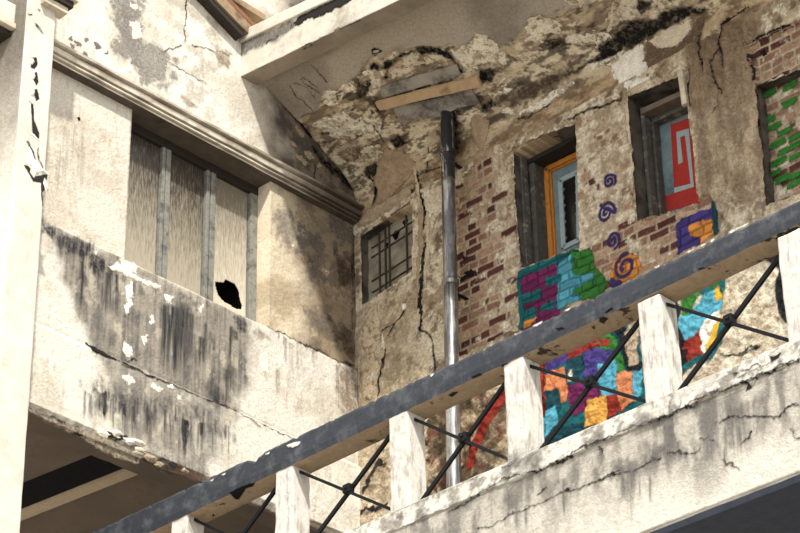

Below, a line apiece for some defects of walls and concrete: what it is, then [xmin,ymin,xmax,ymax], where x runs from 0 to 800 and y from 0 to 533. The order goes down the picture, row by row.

spalling [241,0,351,55]
leakage [482,1,705,110]
crack [687,6,749,112]
peeling [21,57,50,206]
leakage [365,164,377,179]
flaking render [312,0,714,292]
leakage [42,220,118,300]
peeling [108,258,174,315]
leakage [162,304,207,363]
crack [377,148,440,396]
crack [85,342,296,439]
crack [448,359,800,529]